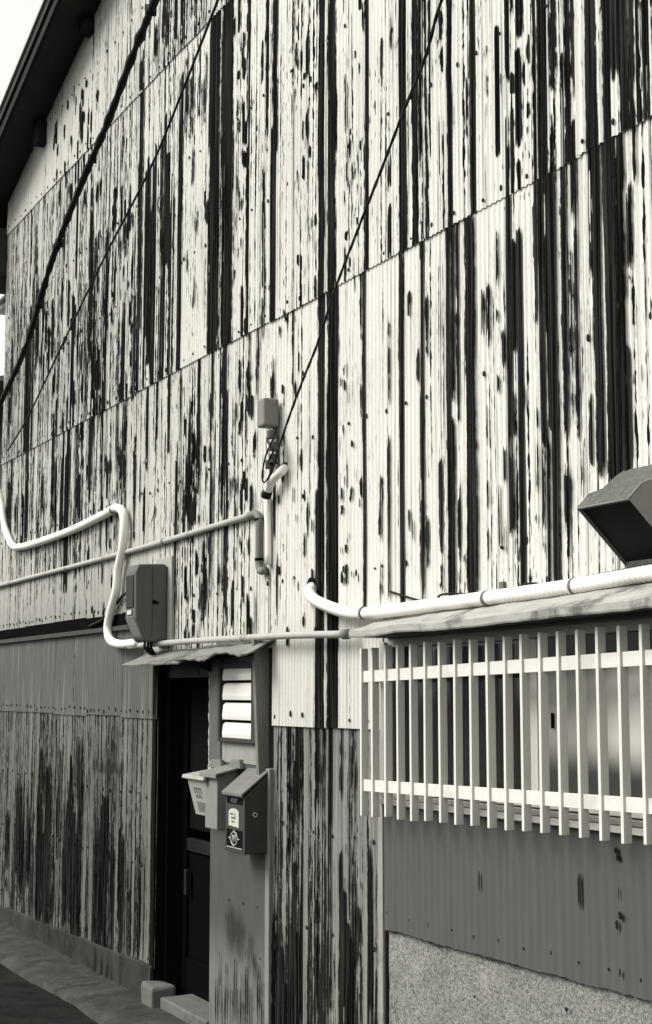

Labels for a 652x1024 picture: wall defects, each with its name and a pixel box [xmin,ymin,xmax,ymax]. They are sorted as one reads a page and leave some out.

corrosion [6,198,93,592]
corrosion [119,51,184,605]
corrosion [206,0,278,634]
corrosion [314,0,372,1024]
corrosion [359,0,560,606]
corrosion [563,0,650,495]
corrosion [4,737,84,936]
corrosion [92,793,141,955]